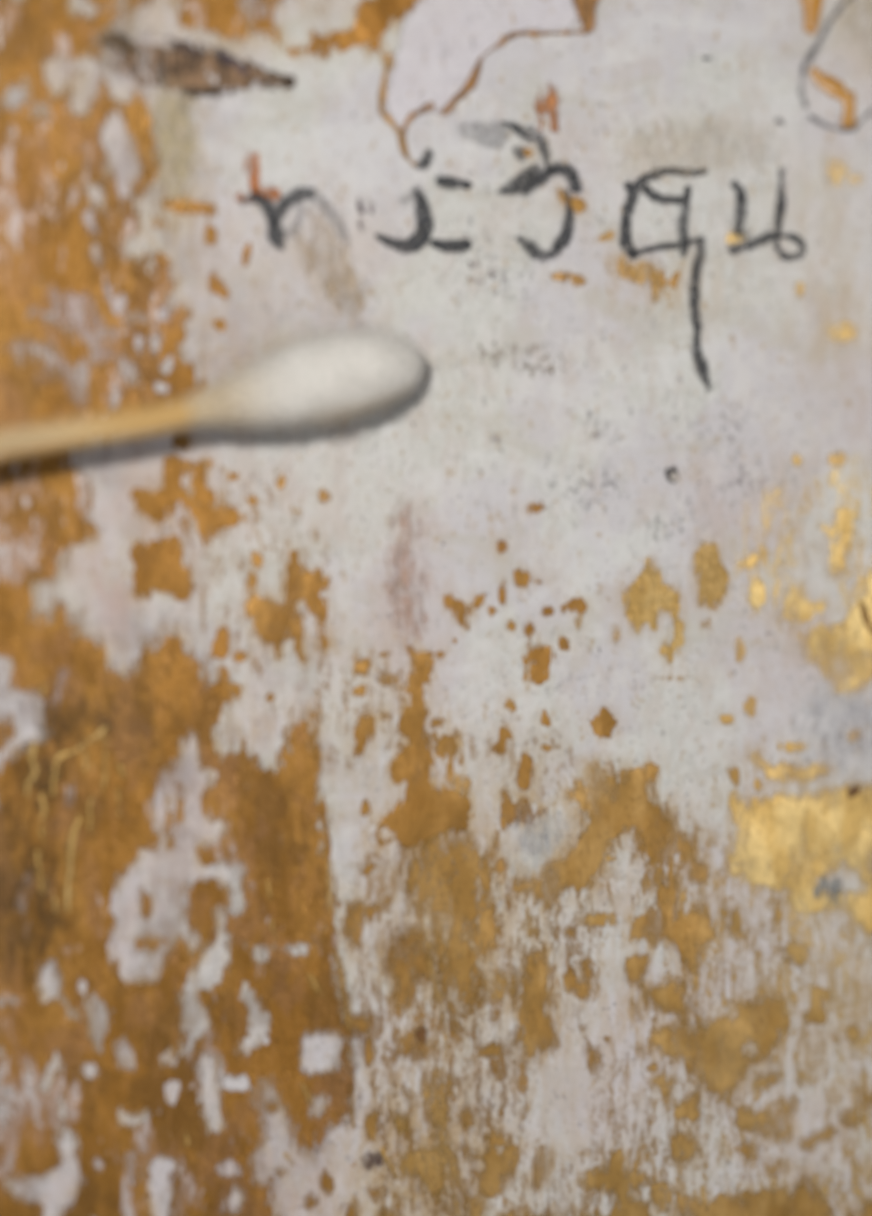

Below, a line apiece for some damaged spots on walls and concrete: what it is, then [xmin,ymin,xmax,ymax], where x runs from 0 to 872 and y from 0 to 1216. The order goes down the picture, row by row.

peeling [39,51,105,117]
spalling [93,29,295,99]
peeling [101,107,142,203]
peeling [0,655,68,774]
peeling [107,730,247,1068]
peeling [3,1052,81,1216]
peeling [36,959,136,1078]
peeling [164,1079,180,1105]
peeling [197,1054,251,1135]
peeling [235,981,270,1056]
peeling [299,1031,343,1076]
peeling [129,1156,177,1216]